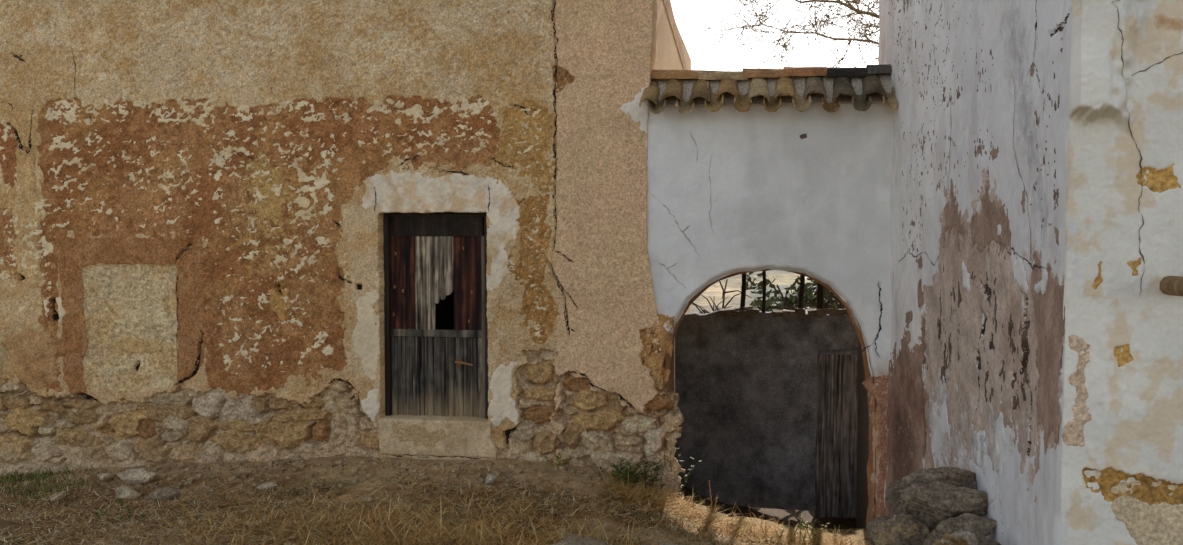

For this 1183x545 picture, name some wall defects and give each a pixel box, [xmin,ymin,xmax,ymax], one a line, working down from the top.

crack [3,101,33,154]
crack [514,0,578,336]
spalling [552,64,575,93]
crack [1002,0,1049,294]
spalling [1136,164,1181,193]
crack [176,243,203,384]
flaking render [0,86,685,498]
flaking render [862,0,1092,543]
spalling [1092,261,1103,290]
spalling [1127,258,1141,276]